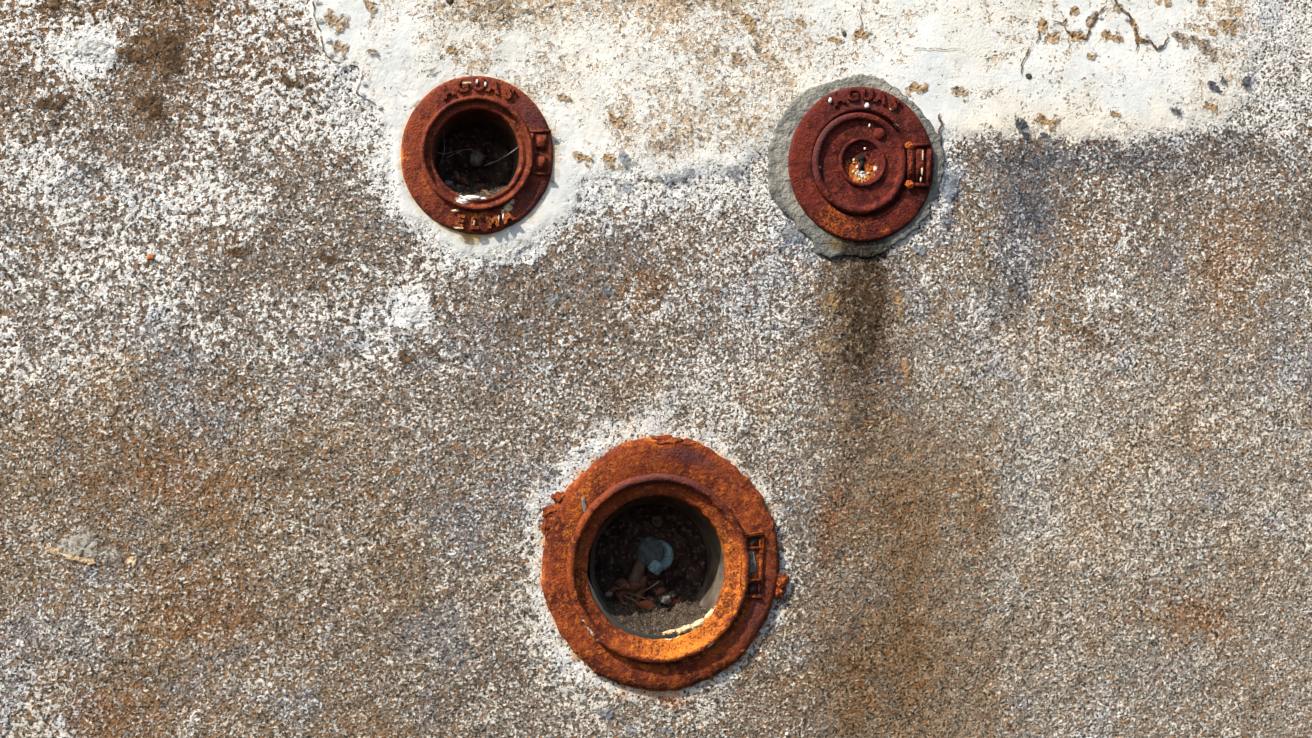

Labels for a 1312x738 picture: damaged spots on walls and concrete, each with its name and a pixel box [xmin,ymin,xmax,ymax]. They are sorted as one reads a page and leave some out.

crack [1021,0,1169,76]
rust [904,142,914,189]
water stain [1015,115,1048,140]
water stain [821,254,904,420]